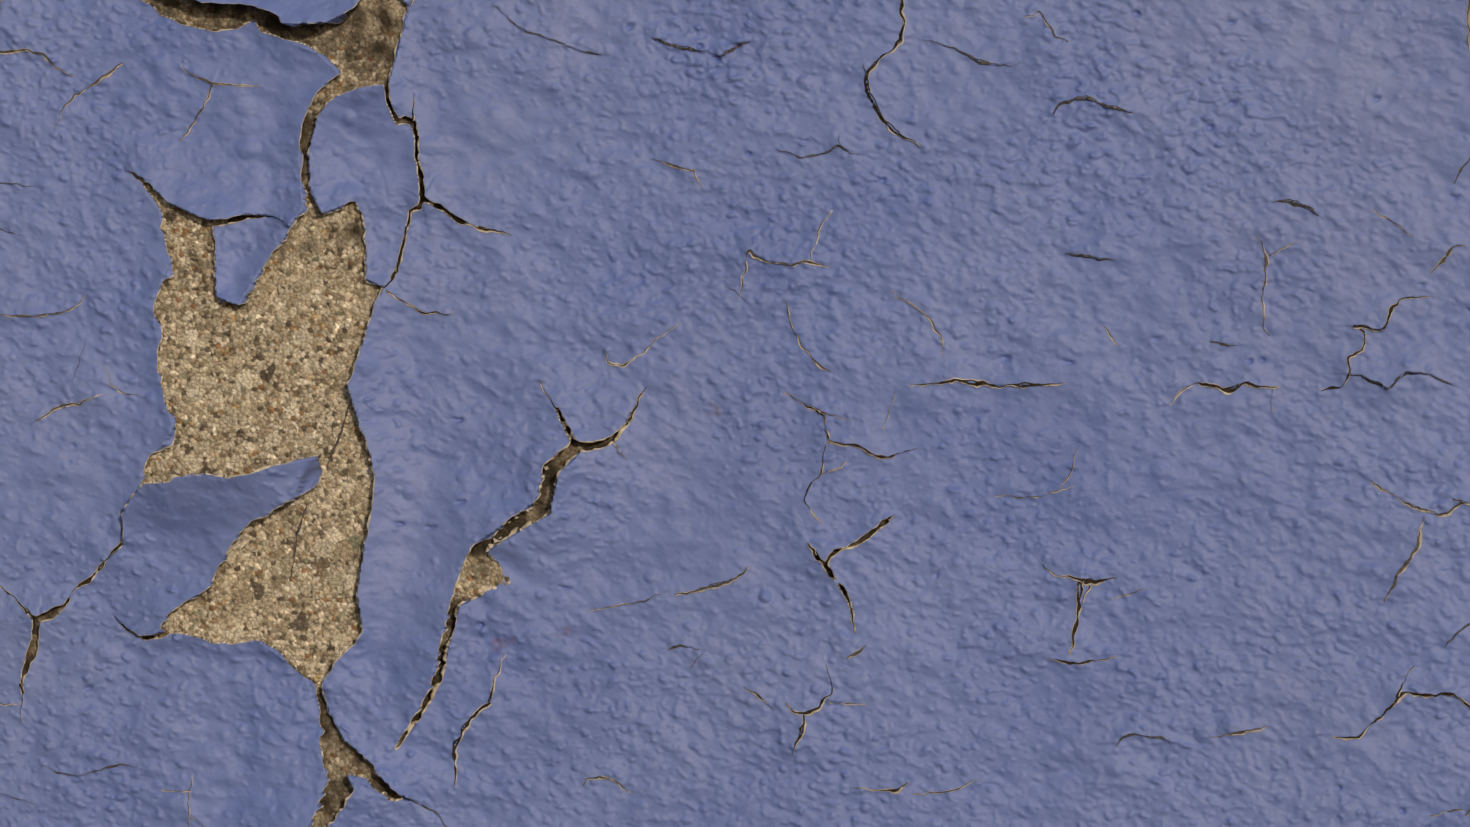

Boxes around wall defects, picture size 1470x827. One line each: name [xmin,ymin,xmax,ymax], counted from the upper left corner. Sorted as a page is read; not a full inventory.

crack [863,0,1020,147]
crack [383,82,510,315]
peeling [93,0,420,827]
crack [1169,381,1280,412]
crack [1321,245,1466,391]
crack [0,516,123,723]
crack [403,654,506,827]
crack [394,322,680,750]
crack [744,290,1065,756]
crack [1043,564,1145,665]
crack [1332,666,1470,740]
crack [1370,480,1470,603]